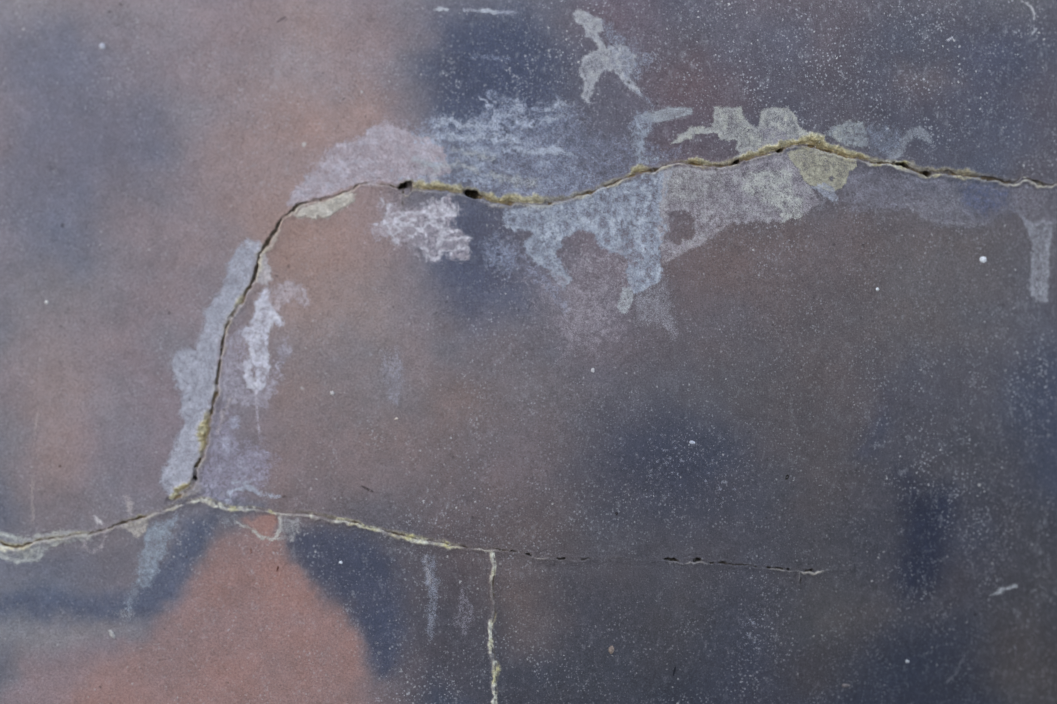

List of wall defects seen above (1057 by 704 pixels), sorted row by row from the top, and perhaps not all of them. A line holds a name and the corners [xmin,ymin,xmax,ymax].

water stain [159,238,311,542]
crack [0,126,1057,558]
water stain [286,7,1057,373]
crack [186,493,858,704]